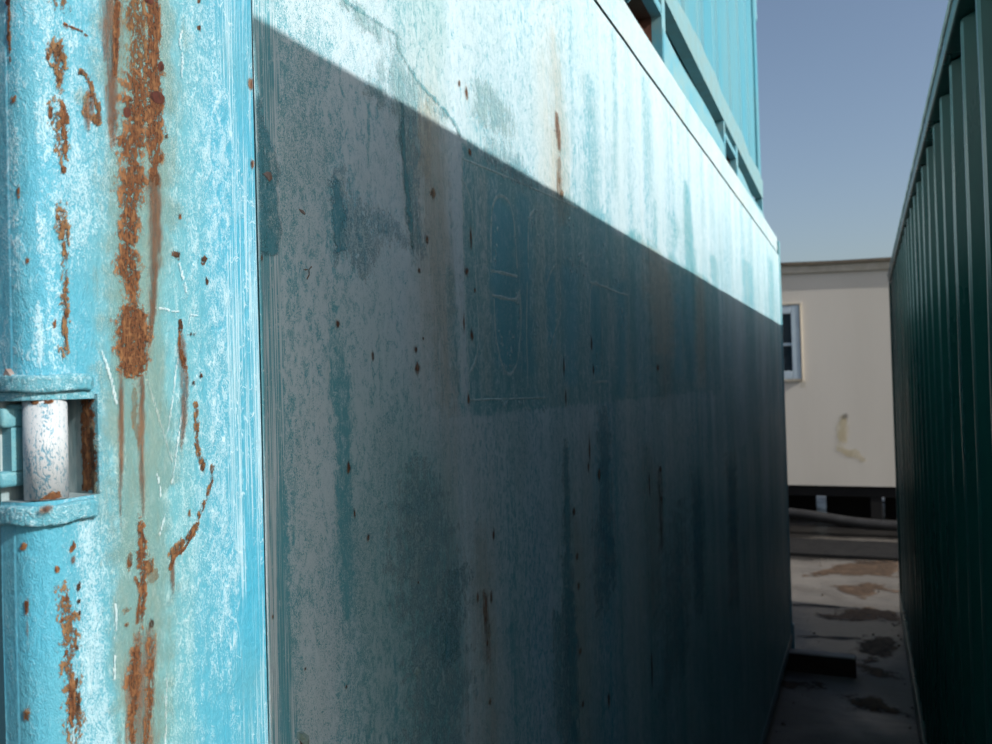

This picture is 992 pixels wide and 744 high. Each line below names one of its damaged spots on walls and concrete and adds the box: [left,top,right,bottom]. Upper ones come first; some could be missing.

rust [46,0,168,502]
rust [54,566,87,744]
rust [122,319,215,744]